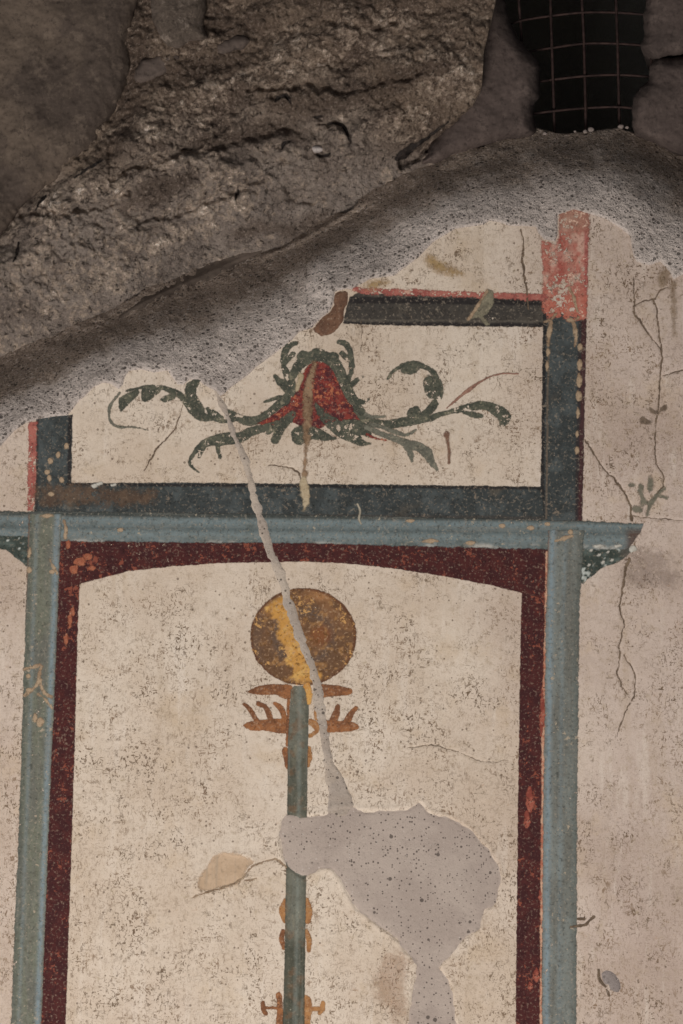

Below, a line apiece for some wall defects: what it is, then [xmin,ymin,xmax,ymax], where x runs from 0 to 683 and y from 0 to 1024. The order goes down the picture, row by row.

spalling [467,289,494,326]
peeling [544,287,582,454]
crack [585,277,683,522]
peeling [640,405,667,424]
crack [214,391,354,816]
crack [616,558,636,735]
flaking render [198,852,253,891]